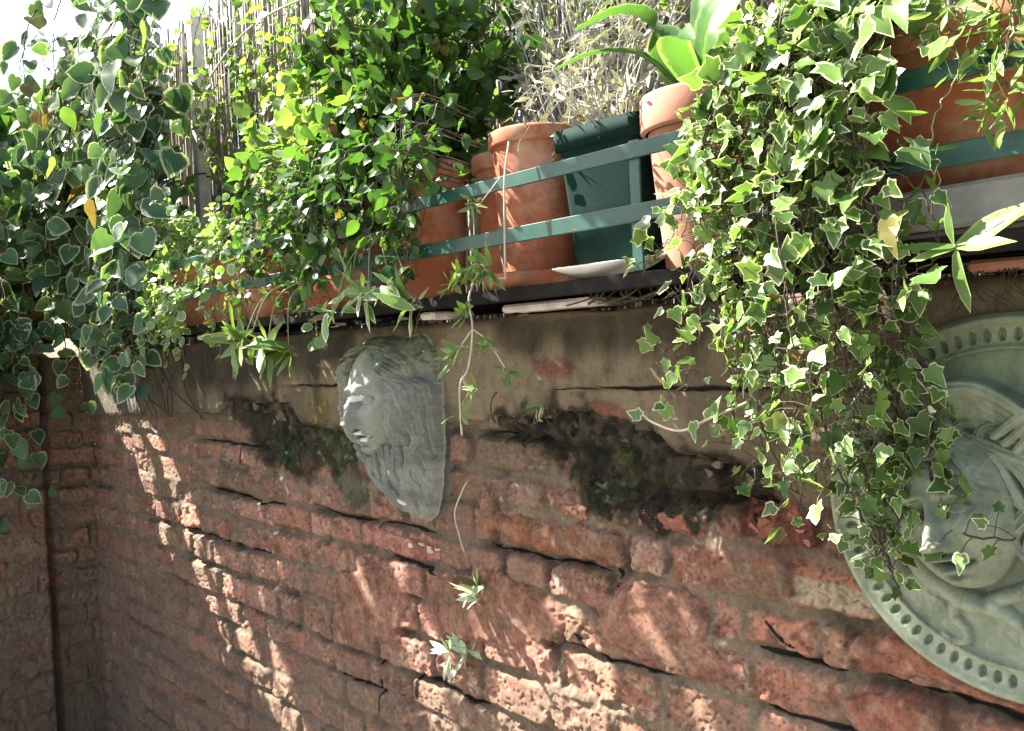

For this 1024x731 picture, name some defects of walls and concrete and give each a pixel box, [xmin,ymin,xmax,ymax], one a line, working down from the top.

damp [224,391,358,481]
damp [494,390,564,427]
damp [524,405,626,515]
crack [554,384,776,392]
spalling [637,494,708,539]
damp [607,440,773,536]
spalling [689,453,819,548]